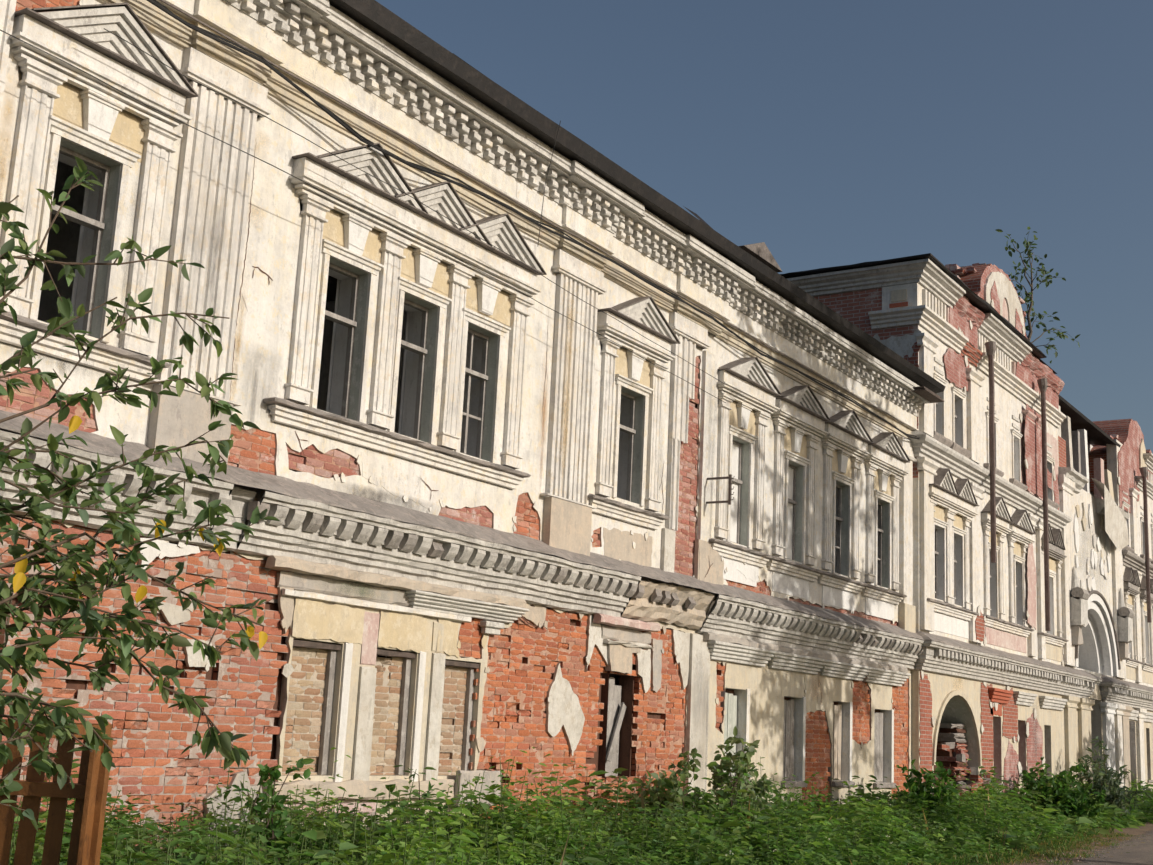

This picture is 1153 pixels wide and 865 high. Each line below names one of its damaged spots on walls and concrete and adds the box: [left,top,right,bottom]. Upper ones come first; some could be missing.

flaking render [15,0,86,13]
flaking render [944,306,978,393]
flaking render [1015,361,1059,410]
peeling [227,424,492,528]
flaking render [512,492,539,540]
flaking render [672,356,898,626]
flaking render [1019,404,1060,510]
spalling [0,517,294,855]
spalling [455,605,690,828]
spalling [851,680,873,748]
spalling [891,671,935,799]
flaking render [980,682,1045,796]